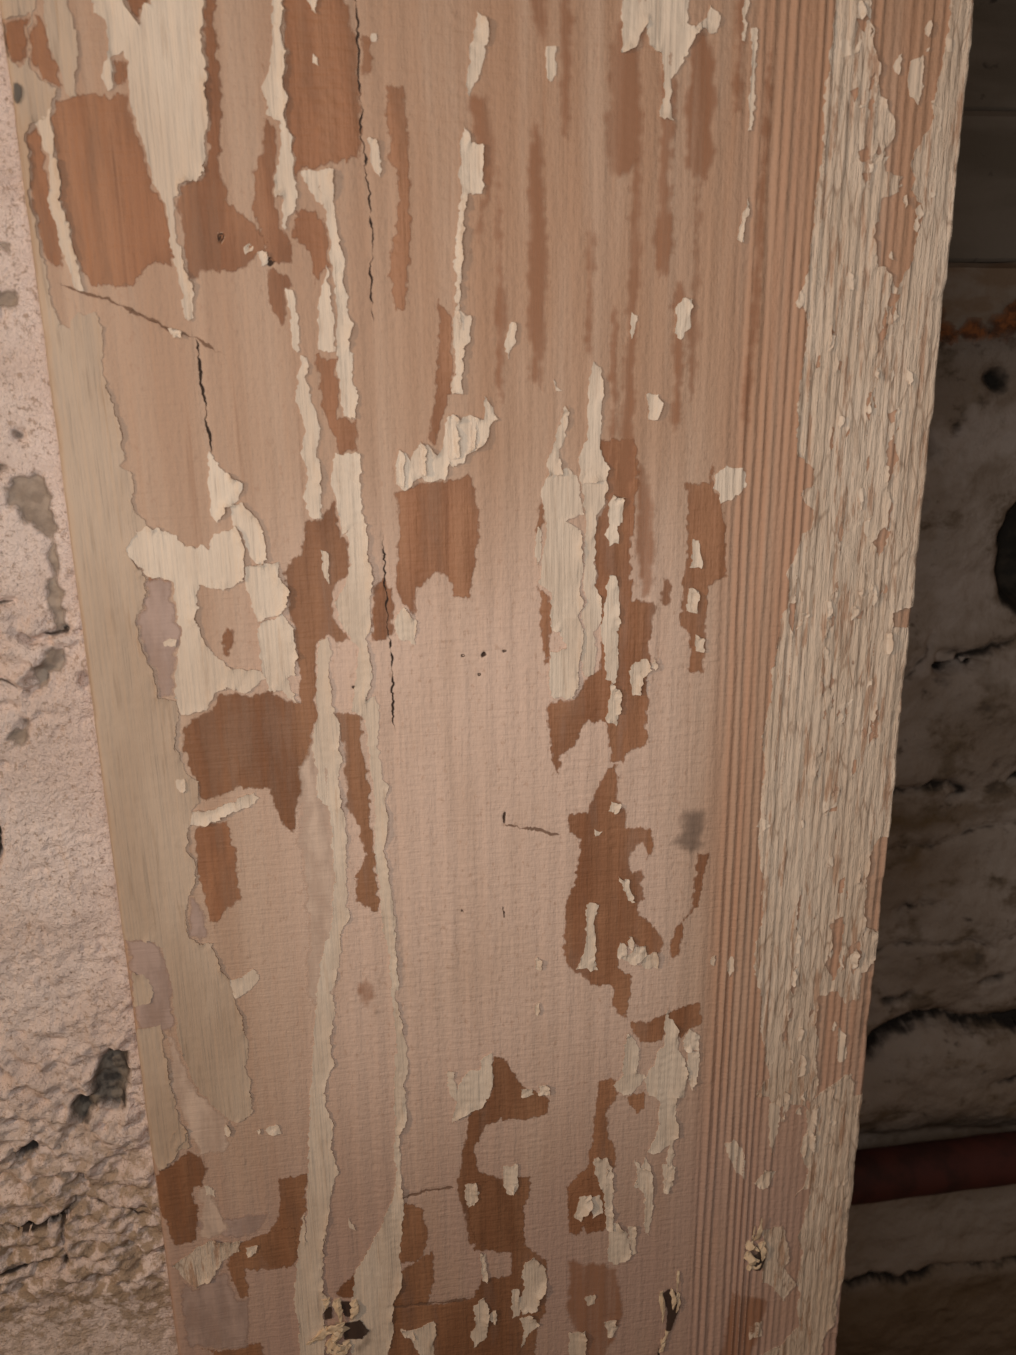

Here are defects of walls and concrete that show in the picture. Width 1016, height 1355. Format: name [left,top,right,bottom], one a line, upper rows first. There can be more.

peeling [545,46,557,82]
peeling [620,0,721,121]
peeling [741,0,758,131]
peeling [737,197,750,243]
peeling [675,298,693,340]
corrosion [940,302,1016,345]
peeling [0,0,550,1355]
peeling [749,0,974,1355]
peeling [534,361,747,1265]
peeling [724,1139,776,1190]
peeling [568,1331,588,1355]
peeling [604,1320,618,1338]